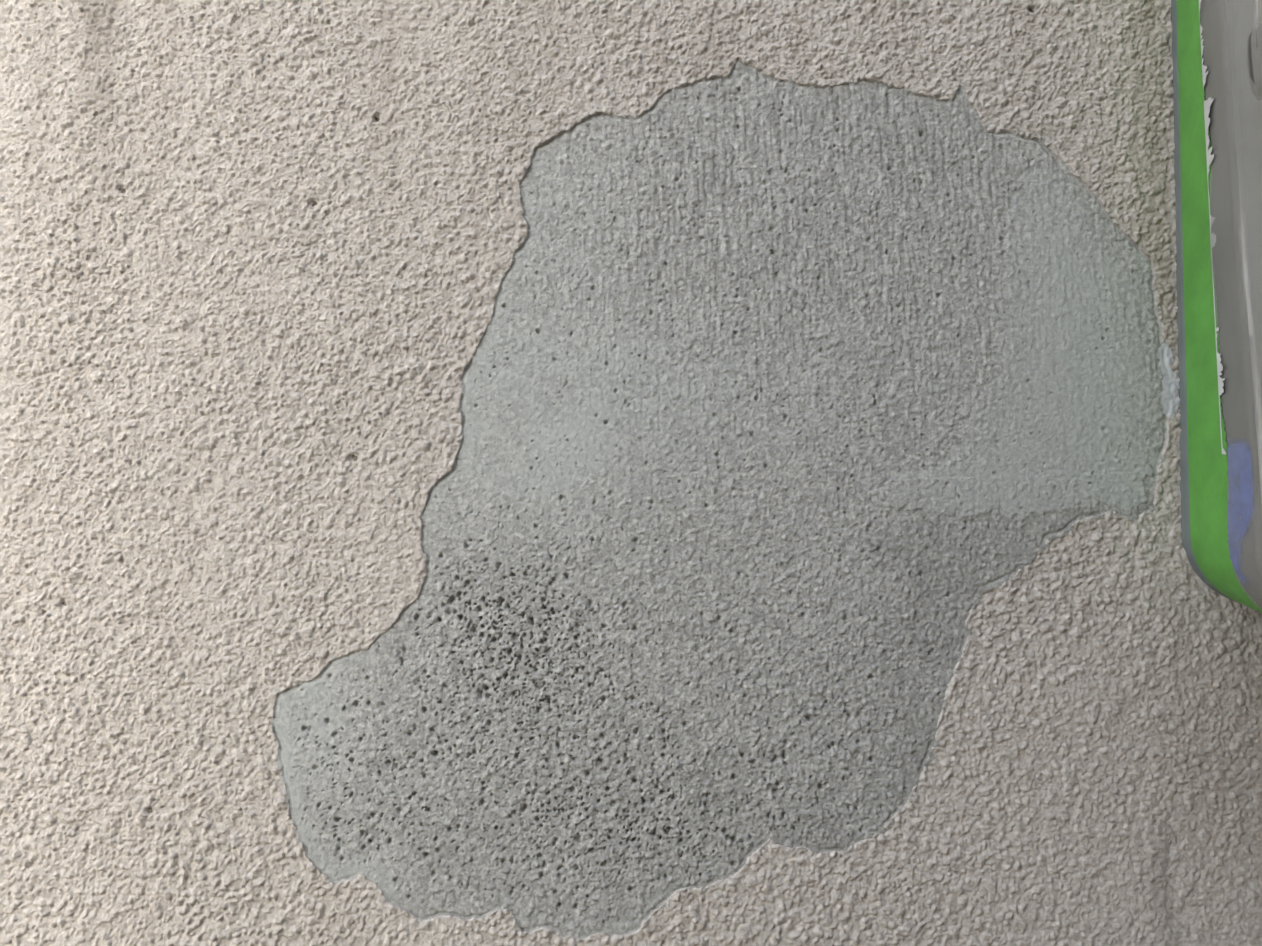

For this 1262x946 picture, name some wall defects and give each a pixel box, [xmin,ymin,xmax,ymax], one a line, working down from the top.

peeling [270,59,1180,942]